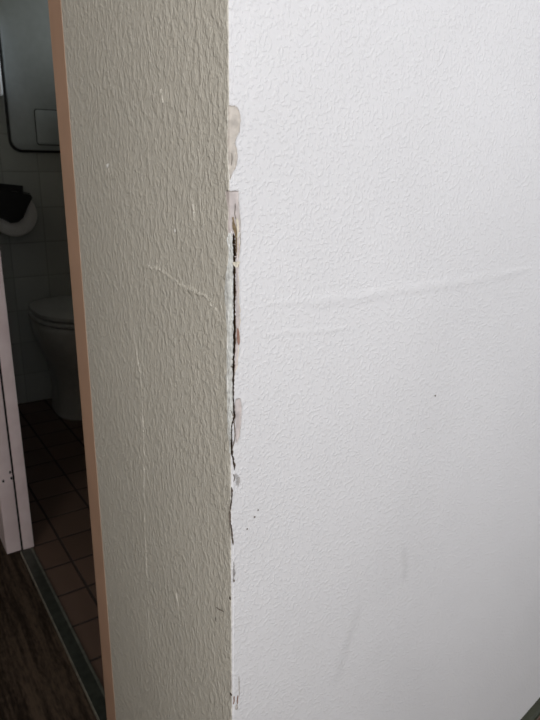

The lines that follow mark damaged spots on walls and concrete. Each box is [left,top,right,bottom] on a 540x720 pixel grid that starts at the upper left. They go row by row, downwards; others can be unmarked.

peeling [227,105,241,179]
crack [229,233,240,545]